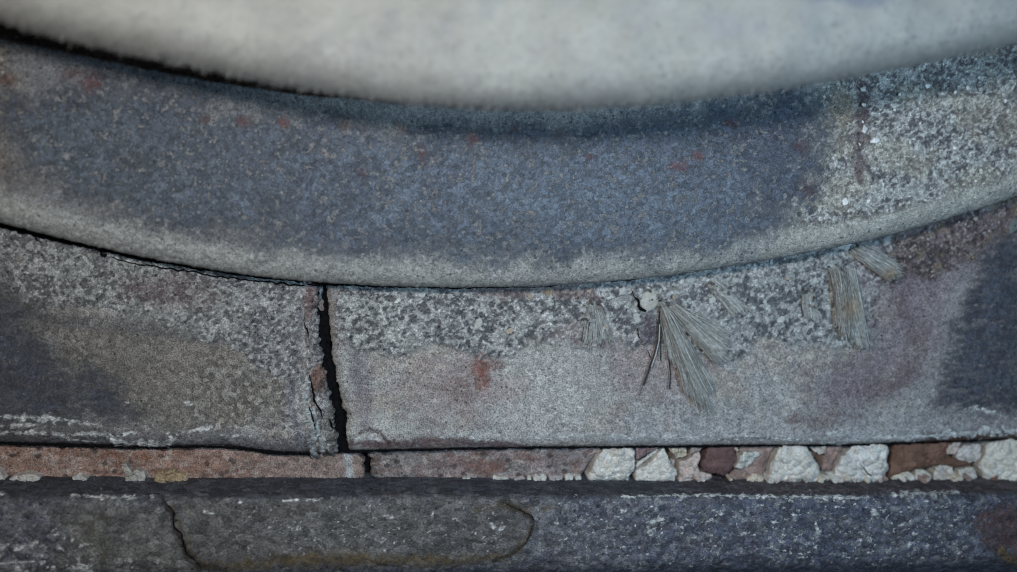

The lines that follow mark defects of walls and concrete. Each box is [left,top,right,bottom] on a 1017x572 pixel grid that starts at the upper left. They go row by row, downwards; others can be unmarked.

crack [0,223,1017,476]
crack [162,498,201,567]